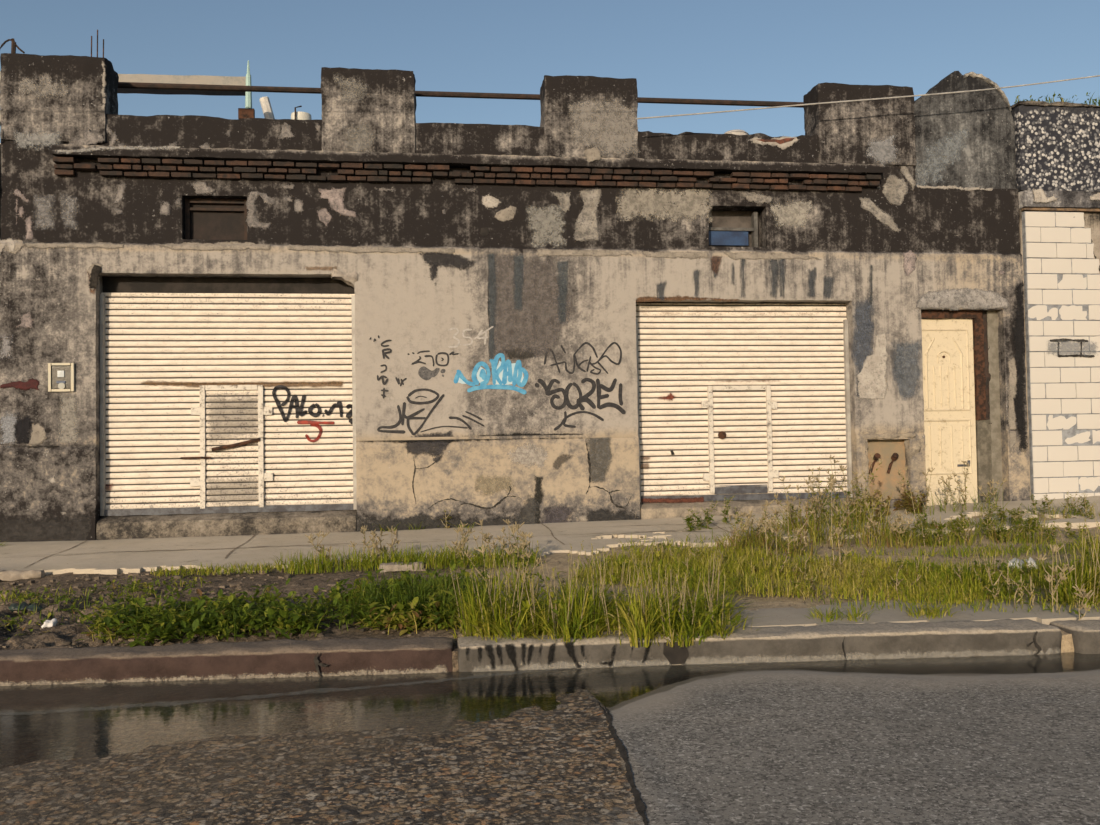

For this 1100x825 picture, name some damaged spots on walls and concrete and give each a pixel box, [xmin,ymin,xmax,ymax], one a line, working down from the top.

peeling [159,198,181,216]
peeling [191,181,215,195]
peeling [246,182,356,229]
peeling [463,187,501,209]
peeling [156,241,271,251]
peeling [286,244,455,254]
spalling [331,268,359,288]
damp [420,252,474,280]
damp [488,253,572,359]
peeling [857,333,888,400]
crack [412,458,521,509]
crack [585,439,632,508]